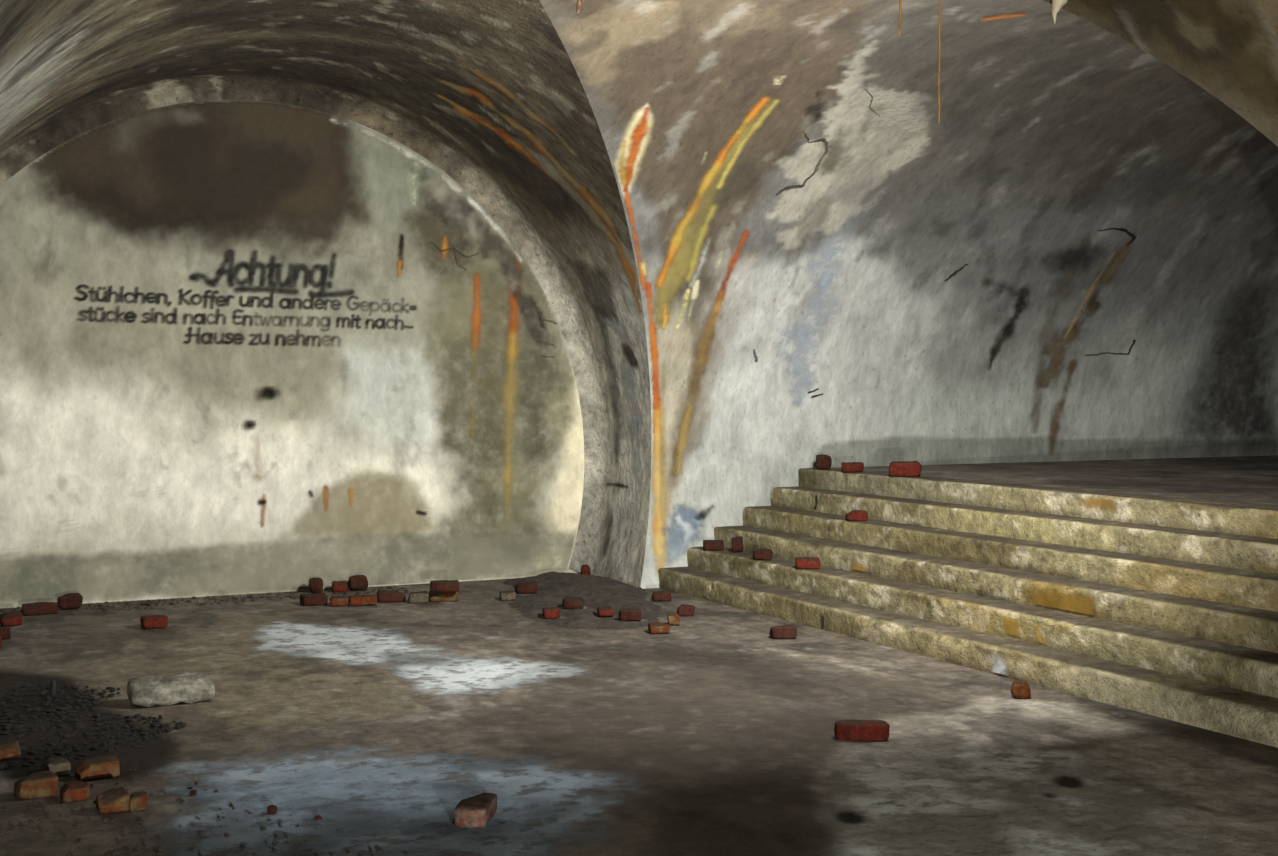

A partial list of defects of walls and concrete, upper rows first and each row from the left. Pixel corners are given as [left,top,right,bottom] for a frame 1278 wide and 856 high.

leakage [0,102,574,599]
rust [437,72,778,570]
leakage [984,280,1029,367]
leakage [1037,239,1131,387]
leakage [1049,399,1064,453]